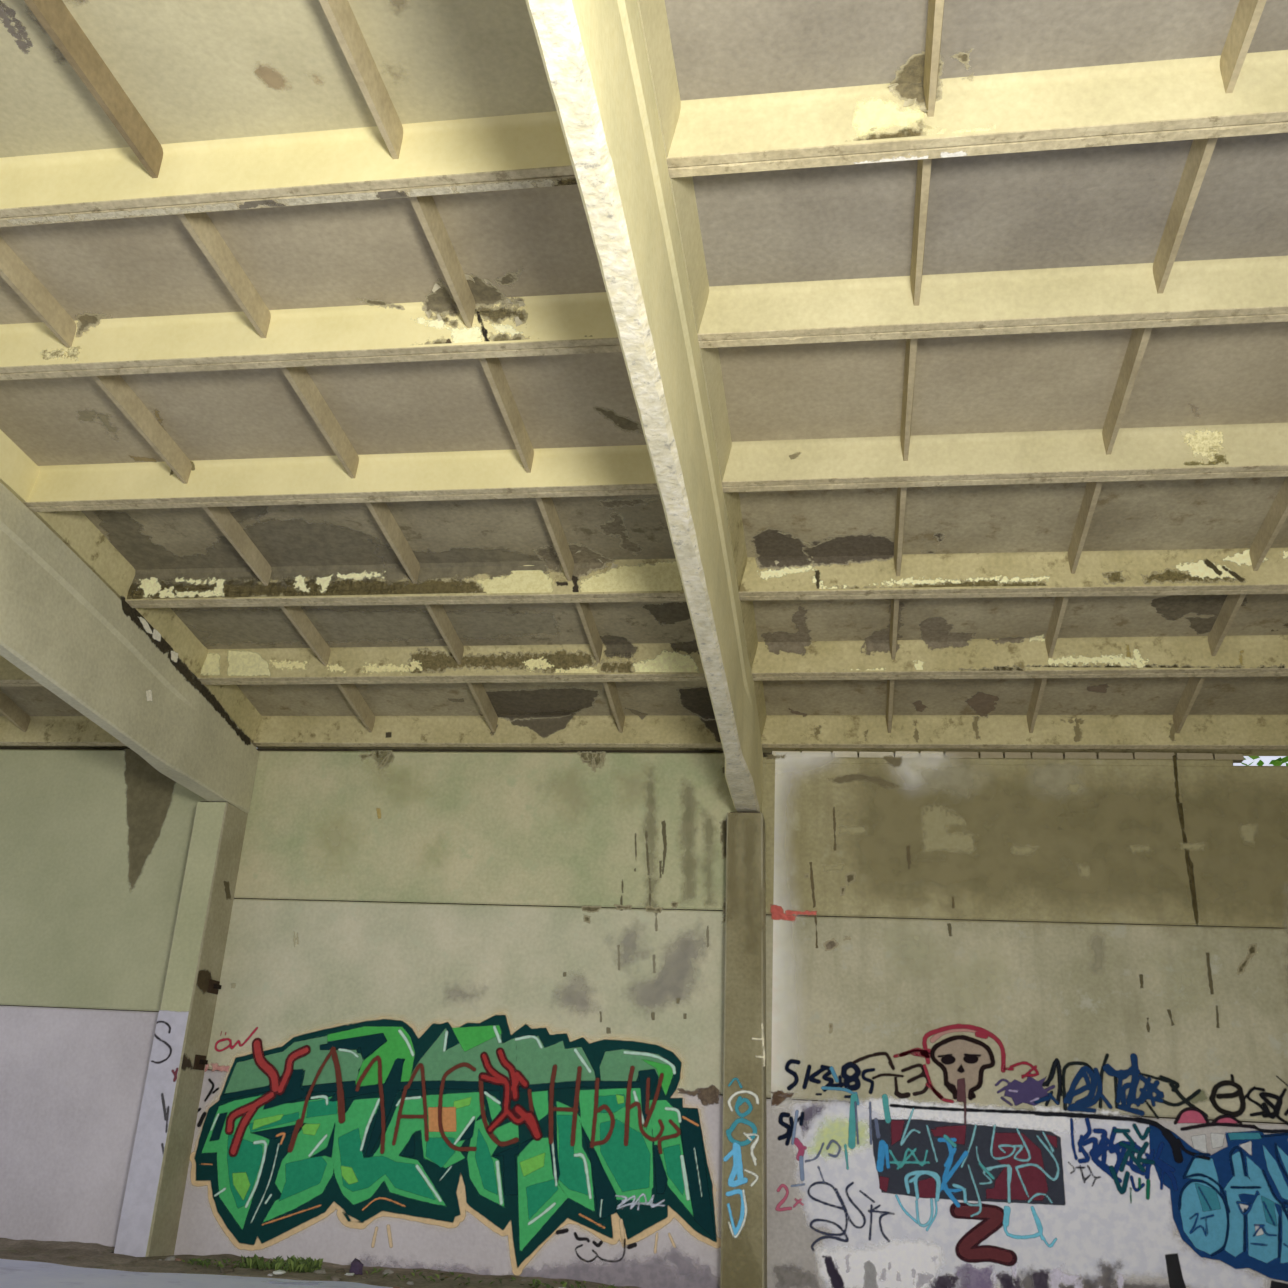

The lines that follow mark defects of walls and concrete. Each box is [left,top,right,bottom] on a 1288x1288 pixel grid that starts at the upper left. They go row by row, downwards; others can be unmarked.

leakage [255,65,285,89]
spalling [845,49,973,142]
peeling [854,151,966,164]
spalling [418,266,529,345]
peeling [1180,428,1228,466]
peeling [750,527,1050,589]
spalling [1102,571,1125,585]
peeling [1141,549,1288,585]
spalling [121,497,721,746]
leakage [124,749,176,889]
leakage [644,775,658,907]
rust [196,970,212,994]